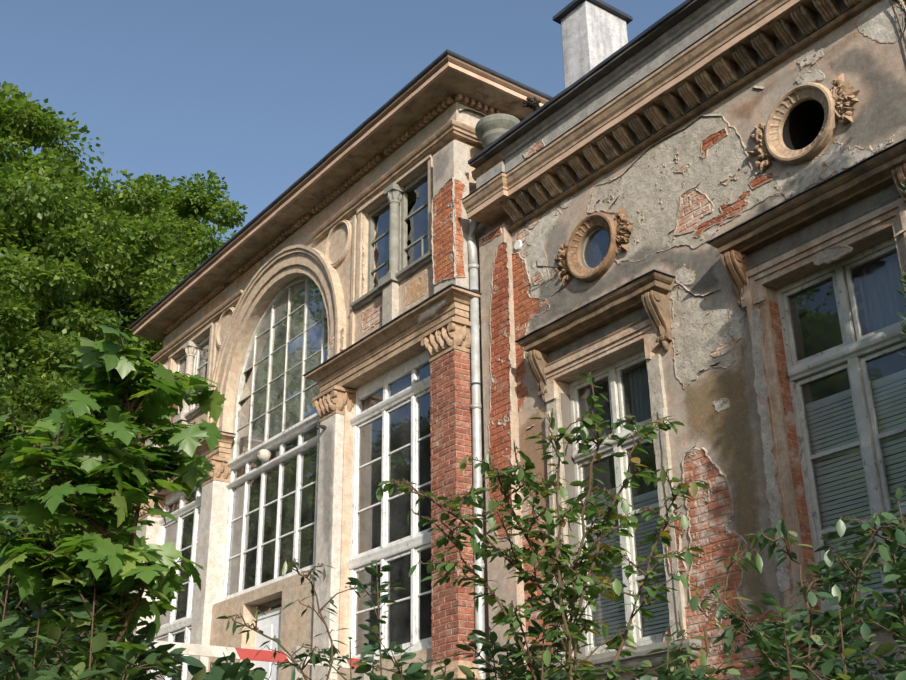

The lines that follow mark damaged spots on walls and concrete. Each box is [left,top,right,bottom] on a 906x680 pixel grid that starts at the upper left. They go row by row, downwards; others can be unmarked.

spalling [854,0,906,44]
flaking render [404,177,466,306]
spalling [587,115,894,266]
flaking render [481,197,573,670]
water stain [686,368,765,606]
spalling [670,264,791,593]
flaking render [663,447,812,680]